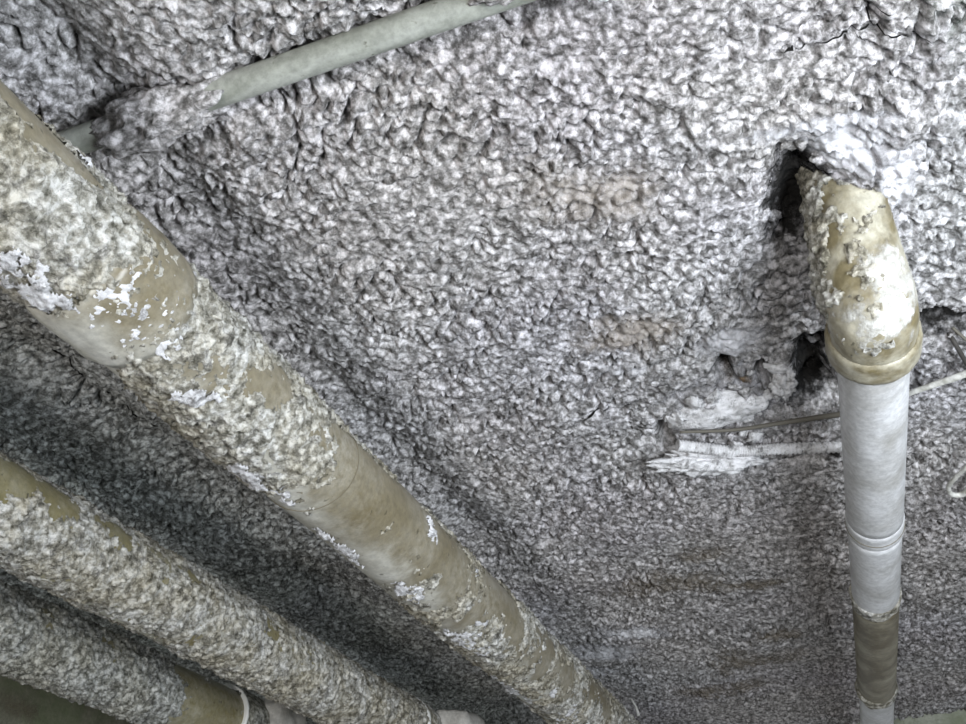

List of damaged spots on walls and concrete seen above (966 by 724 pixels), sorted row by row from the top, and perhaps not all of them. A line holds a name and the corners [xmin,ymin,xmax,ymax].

spalling [753,137,830,255]
spalling [658,330,838,447]